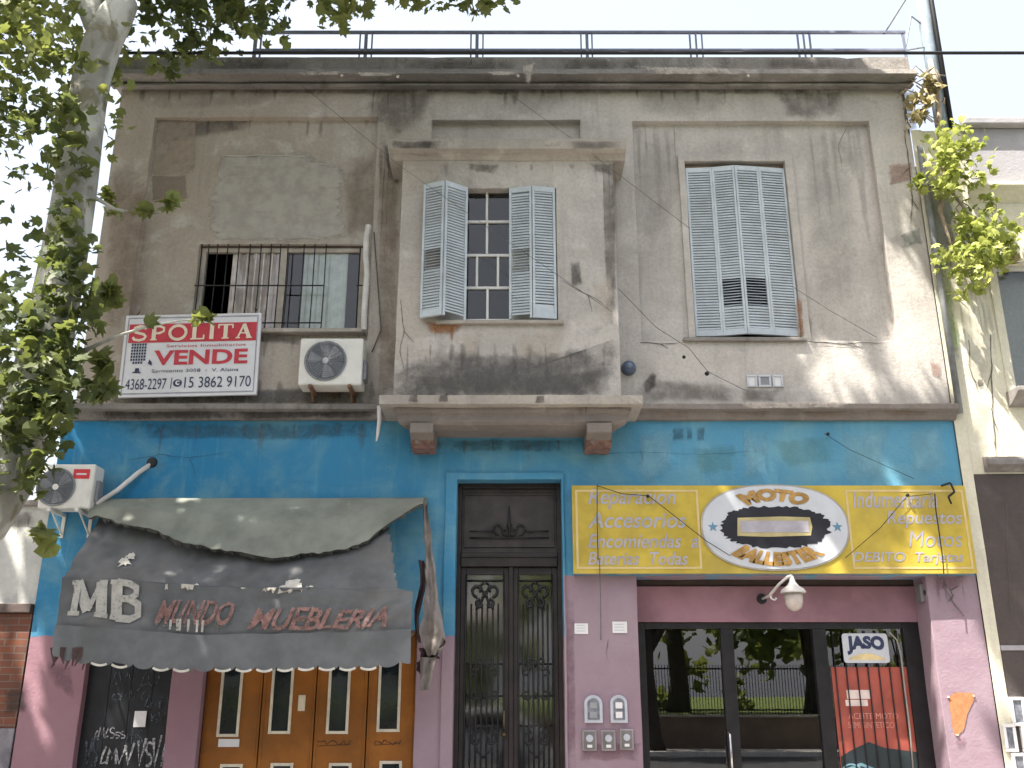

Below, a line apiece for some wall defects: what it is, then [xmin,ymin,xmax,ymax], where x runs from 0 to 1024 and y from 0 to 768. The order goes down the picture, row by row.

corrosion [429,323,458,338]
leakage [413,351,605,395]